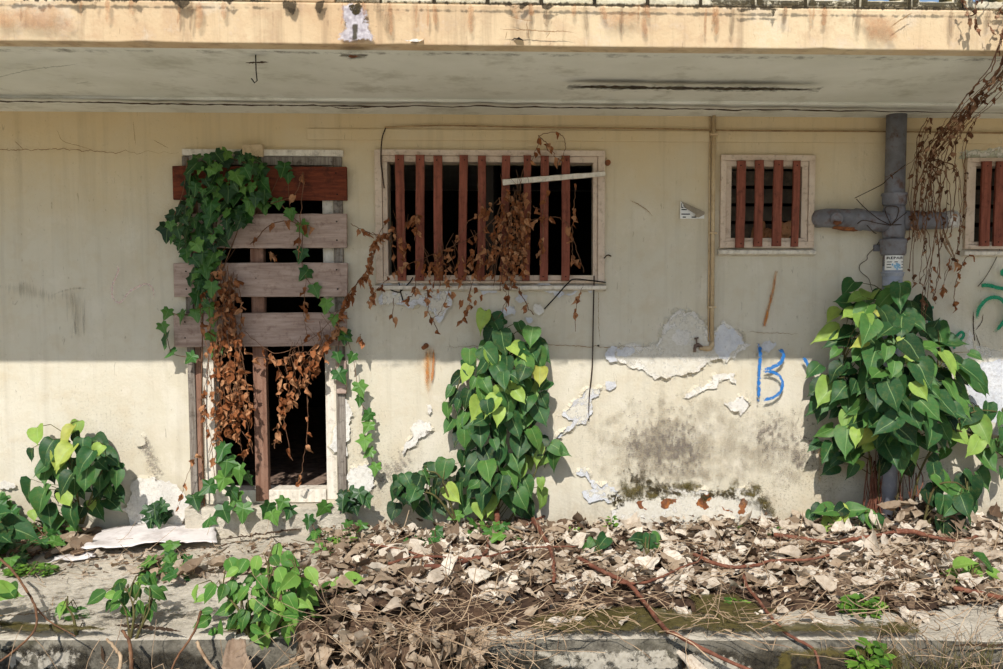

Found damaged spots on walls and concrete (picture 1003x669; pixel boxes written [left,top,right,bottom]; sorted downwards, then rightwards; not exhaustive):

peeling [378,280,498,323]
peeling [499,283,602,326]
peeling [400,404,436,455]
rust [426,351,435,382]
peeling [553,381,616,441]
peeling [597,307,776,416]
mould [607,402,774,516]
mould [757,410,818,474]
peeling [964,328,1003,438]